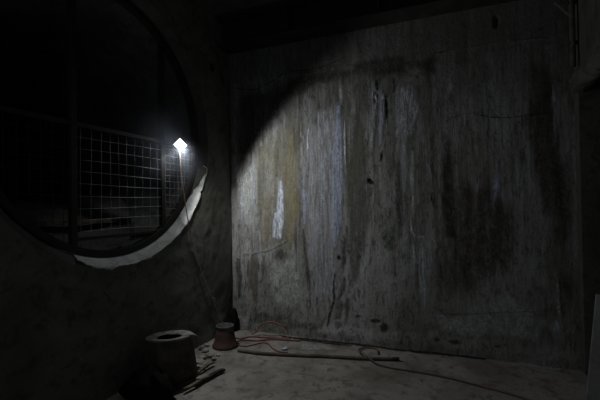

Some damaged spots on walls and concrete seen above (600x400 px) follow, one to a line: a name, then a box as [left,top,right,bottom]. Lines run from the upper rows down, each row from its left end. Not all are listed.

water stain [239,70,366,305]
water stain [443,152,510,290]
crack [282,271,485,359]